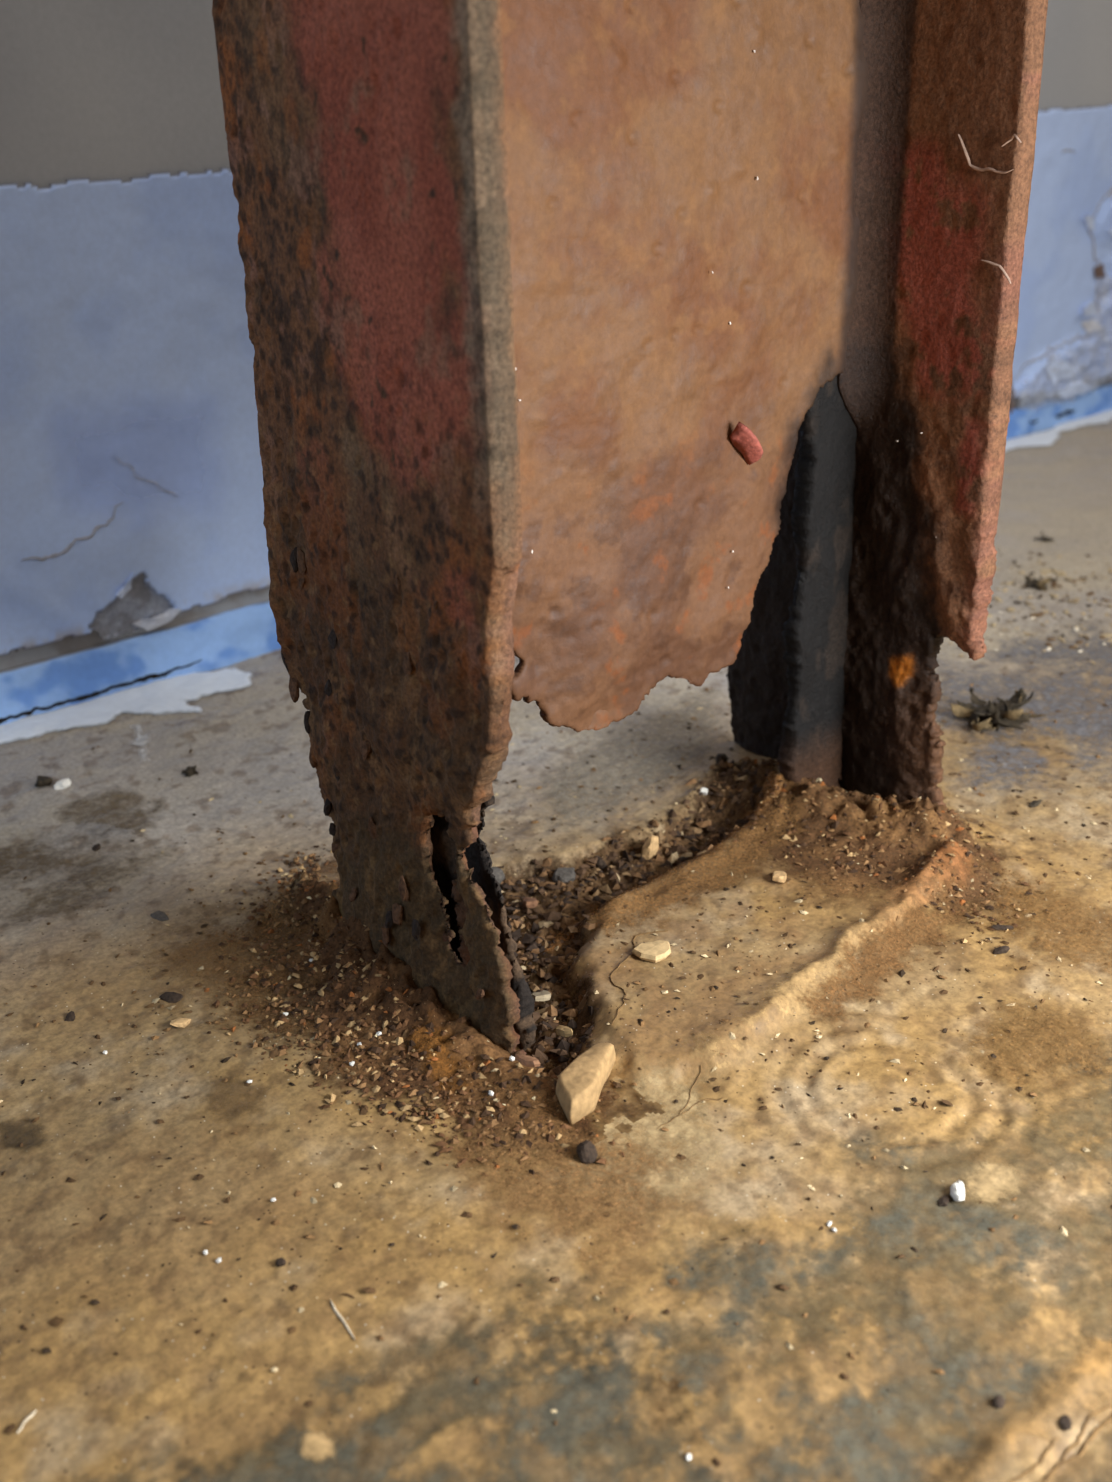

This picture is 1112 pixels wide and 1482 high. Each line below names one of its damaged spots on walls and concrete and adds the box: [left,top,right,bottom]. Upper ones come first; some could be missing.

spalling [88,572,181,640]
corrosion [590,775,1112,1022]
corrosion [971,1001,1111,1088]
water stain [0,1121,44,1149]
water stain [560,1071,719,1197]
water stain [641,1042,1112,1482]
water stain [179,1286,720,1482]
crack [1009,1405,1112,1482]